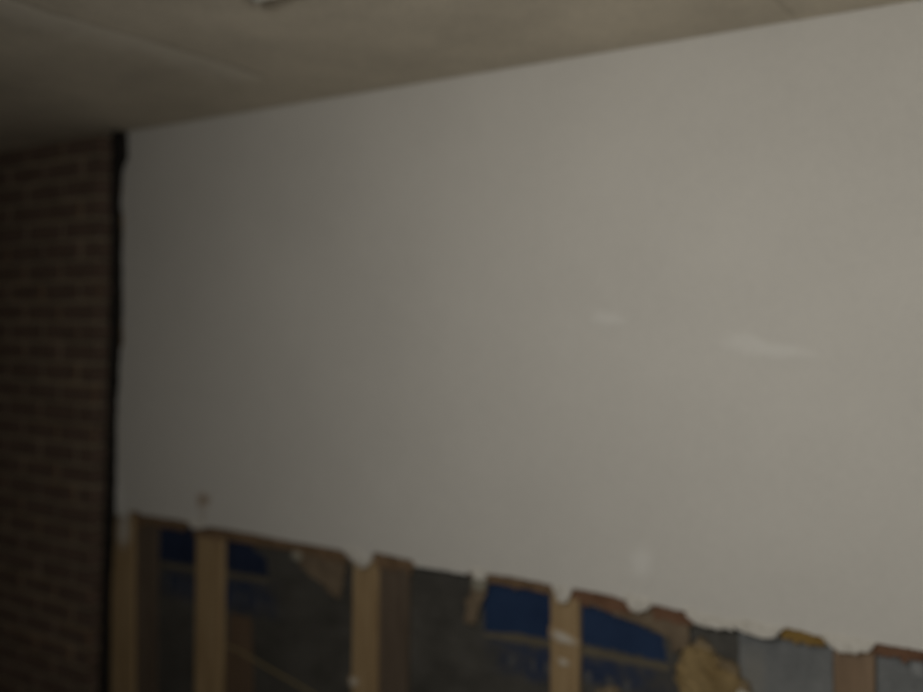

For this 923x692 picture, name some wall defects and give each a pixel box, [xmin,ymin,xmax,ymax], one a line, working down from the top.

peeling [115,463,416,575]
peeling [469,566,923,663]
peeling [675,643,745,692]